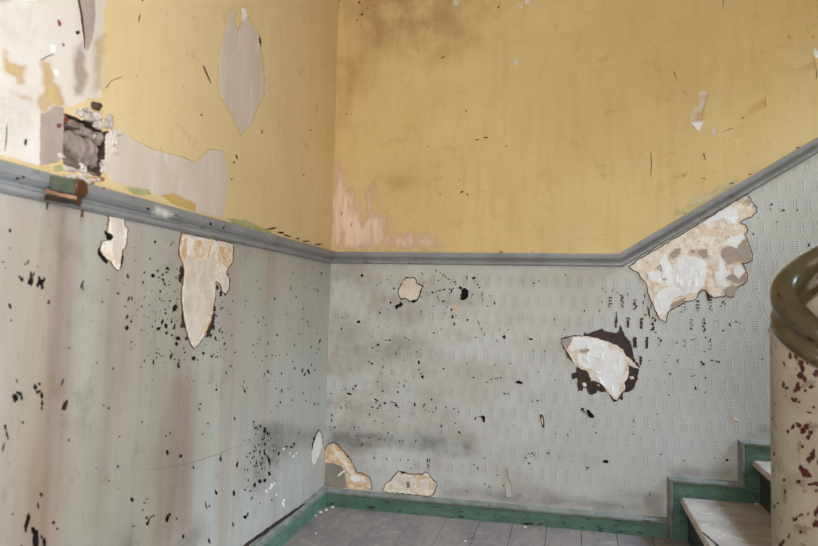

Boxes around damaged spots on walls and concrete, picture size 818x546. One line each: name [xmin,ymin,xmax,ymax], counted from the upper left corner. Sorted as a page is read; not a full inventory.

peeling [0,0,322,245]
peeling [690,91,709,132]
peeling [332,164,435,249]
peeling [18,260,46,290]
peeling [97,216,135,279]
peeling [117,233,236,369]
peeling [369,270,496,326]
peeling [233,421,295,504]
peeling [311,385,357,465]